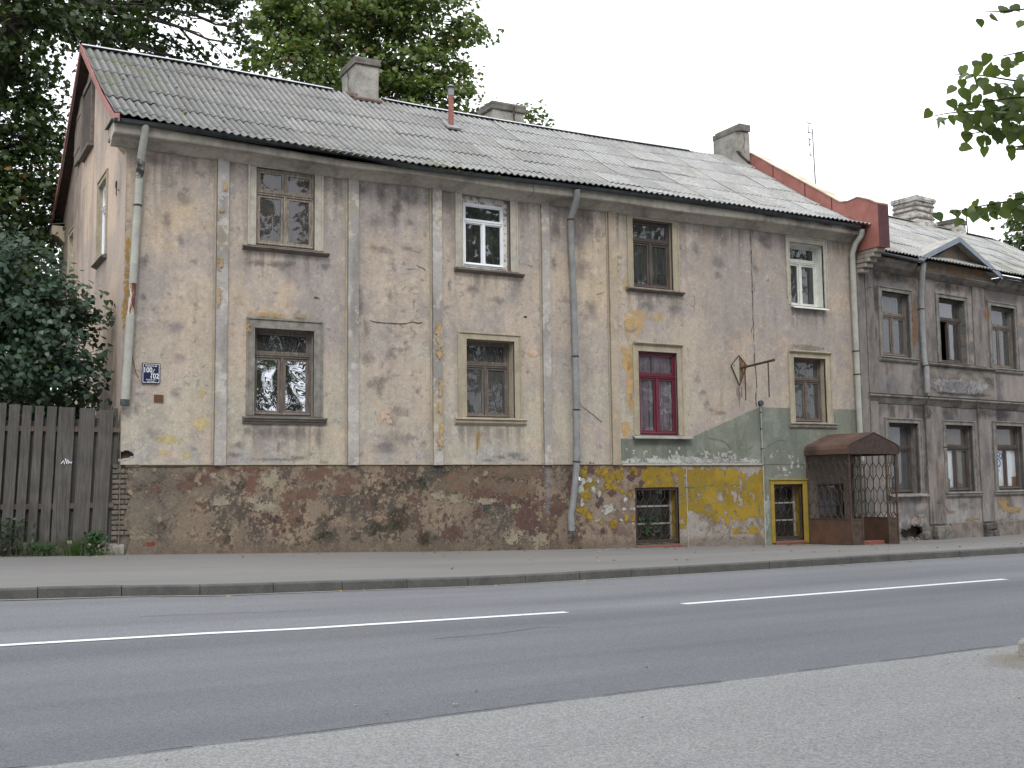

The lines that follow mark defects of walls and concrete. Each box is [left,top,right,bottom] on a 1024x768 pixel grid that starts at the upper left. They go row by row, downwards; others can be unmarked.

crack [370,299,427,339]
peeling [567,308,761,534]
peeling [110,434,362,555]
flaking render [900,513,926,541]